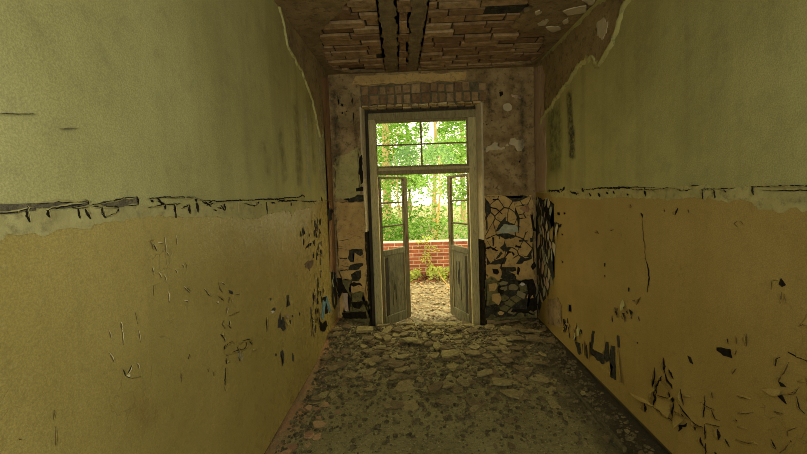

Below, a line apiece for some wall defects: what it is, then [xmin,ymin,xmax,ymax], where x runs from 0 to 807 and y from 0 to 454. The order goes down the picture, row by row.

flaking render [534,0,631,125]
peeling [0,0,385,342]
peeling [484,183,807,380]
peeling [655,381,685,429]
peeling [762,352,807,404]